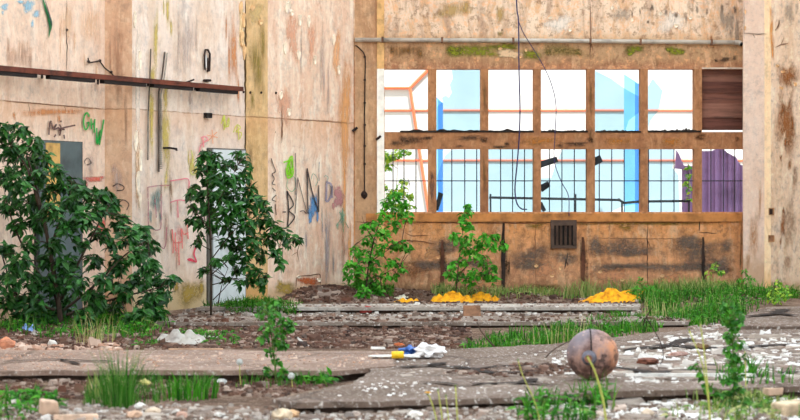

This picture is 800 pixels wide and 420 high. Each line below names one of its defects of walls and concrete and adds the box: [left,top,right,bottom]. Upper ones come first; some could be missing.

rust [226,19,237,74]
leakage [494,44,550,58]
rust [778,98,796,168]